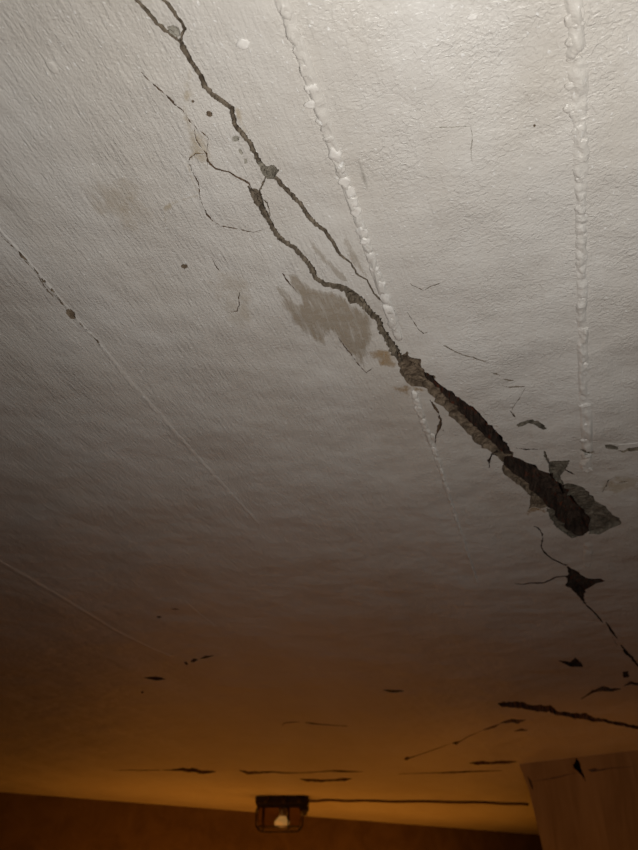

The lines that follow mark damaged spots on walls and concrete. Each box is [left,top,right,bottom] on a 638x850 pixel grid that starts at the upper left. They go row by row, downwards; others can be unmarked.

peeling [274,0,402,341]
crack [135,0,638,538]
peeling [510,411,547,430]
spalling [514,526,638,667]
crack [112,767,216,775]
crack [239,770,362,782]
crack [403,681,638,789]